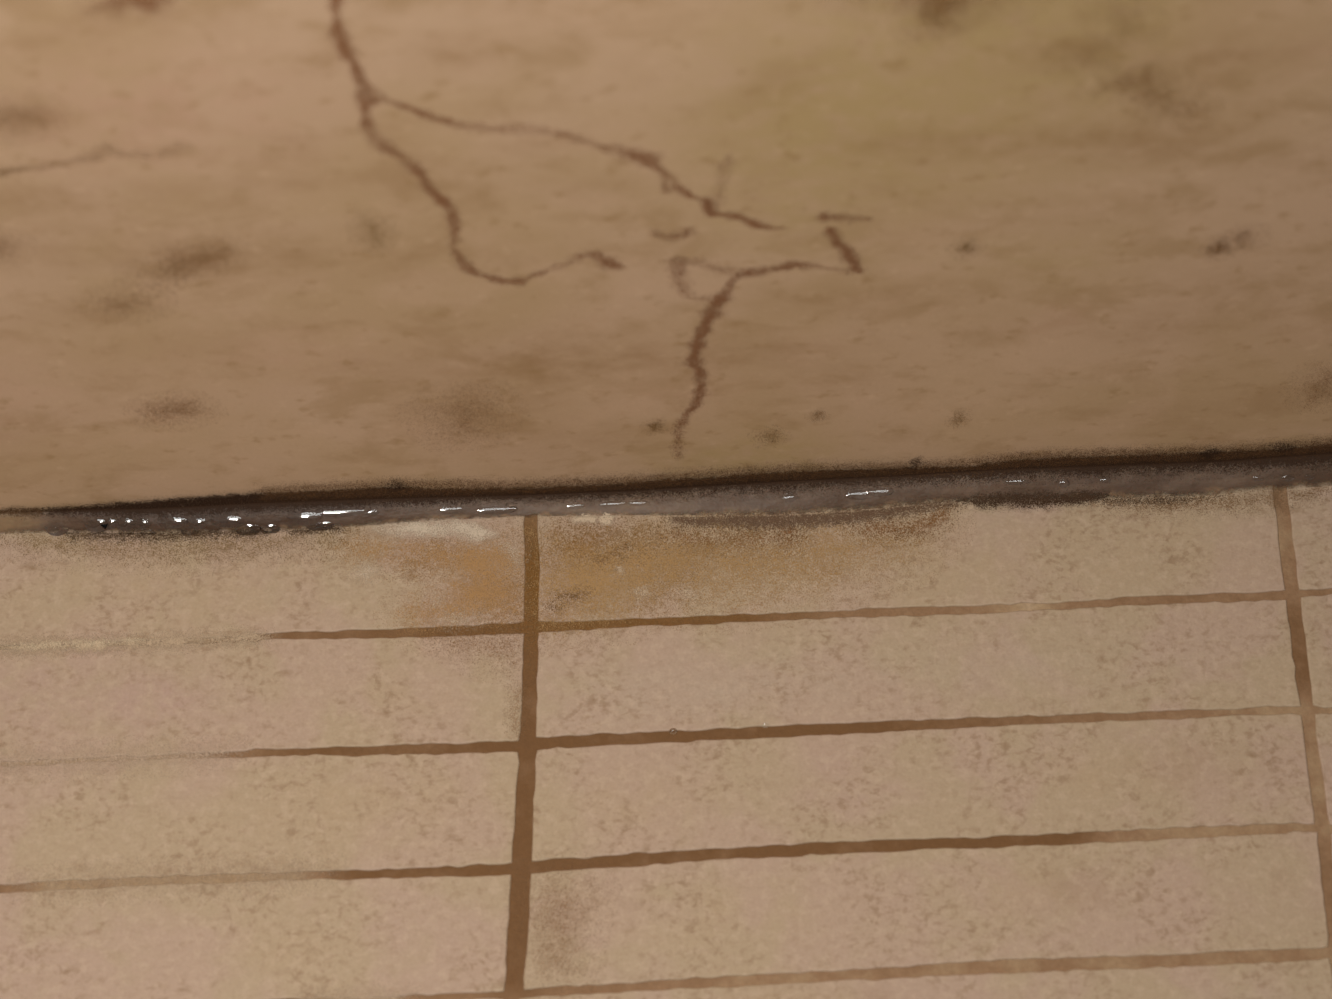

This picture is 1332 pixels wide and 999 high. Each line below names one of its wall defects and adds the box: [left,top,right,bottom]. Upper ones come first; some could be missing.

crack [325,0,873,459]
leakage [0,436,1332,569]